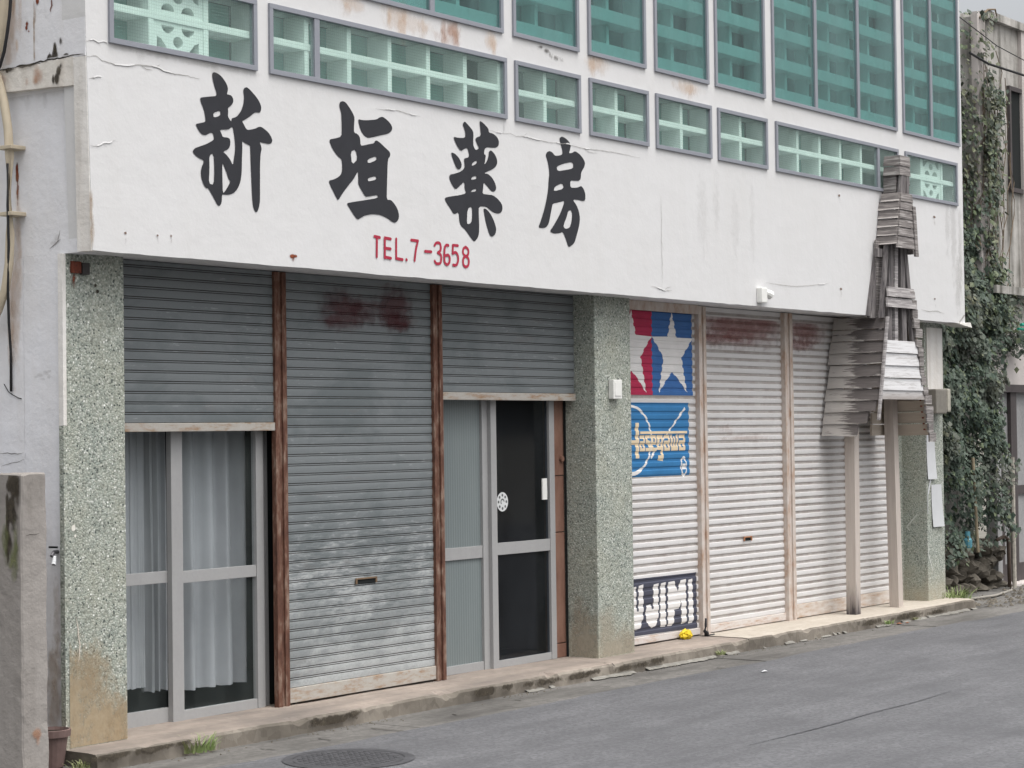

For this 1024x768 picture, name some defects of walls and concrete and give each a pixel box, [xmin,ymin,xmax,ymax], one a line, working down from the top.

crack [0,38,198,79]
crack [496,121,639,158]
leakage [5,476,19,563]